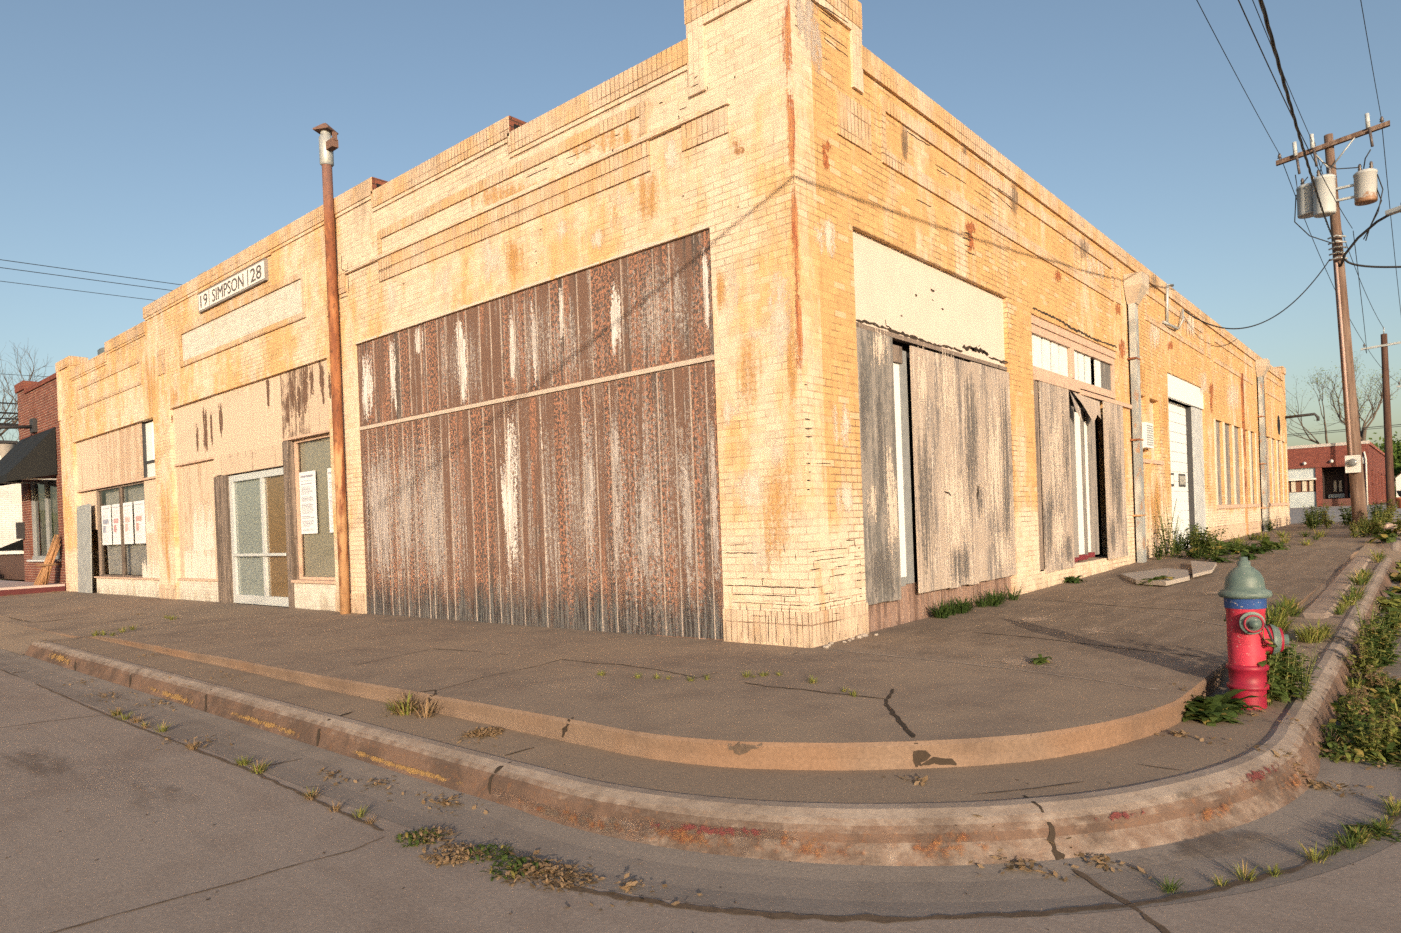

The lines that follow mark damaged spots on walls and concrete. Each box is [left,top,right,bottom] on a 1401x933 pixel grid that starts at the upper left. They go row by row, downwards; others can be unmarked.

rust [782,0,795,171]
rust [822,141,831,169]
rust [791,188,803,371]